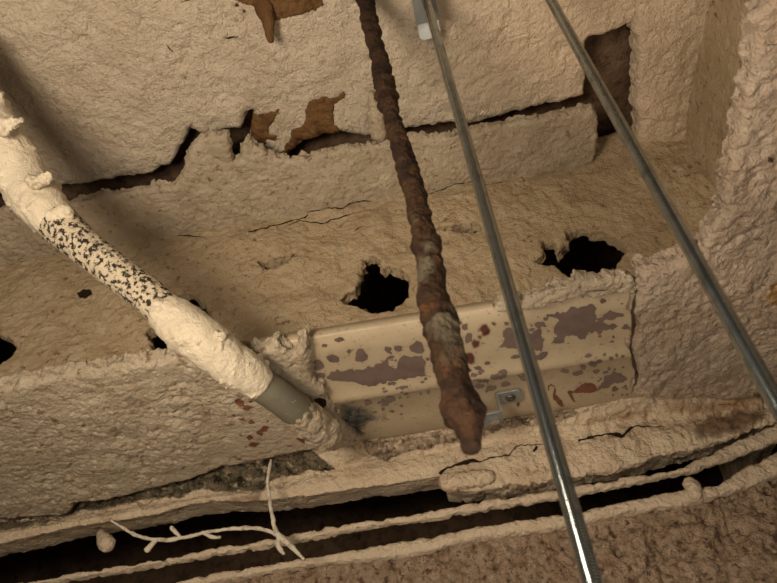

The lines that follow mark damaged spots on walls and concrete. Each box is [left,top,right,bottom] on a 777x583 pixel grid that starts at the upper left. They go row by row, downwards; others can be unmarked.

rust [235,0,323,43]
rust [251,109,279,144]
rust [279,91,345,154]
crack [248,200,371,232]
rust [467,323,495,364]
peeling [529,299,630,360]
peeling [314,337,430,415]
peeling [469,361,511,393]
peeling [561,353,629,396]
spalling [363,431,460,461]
crack [439,444,543,475]
crack [578,425,662,450]